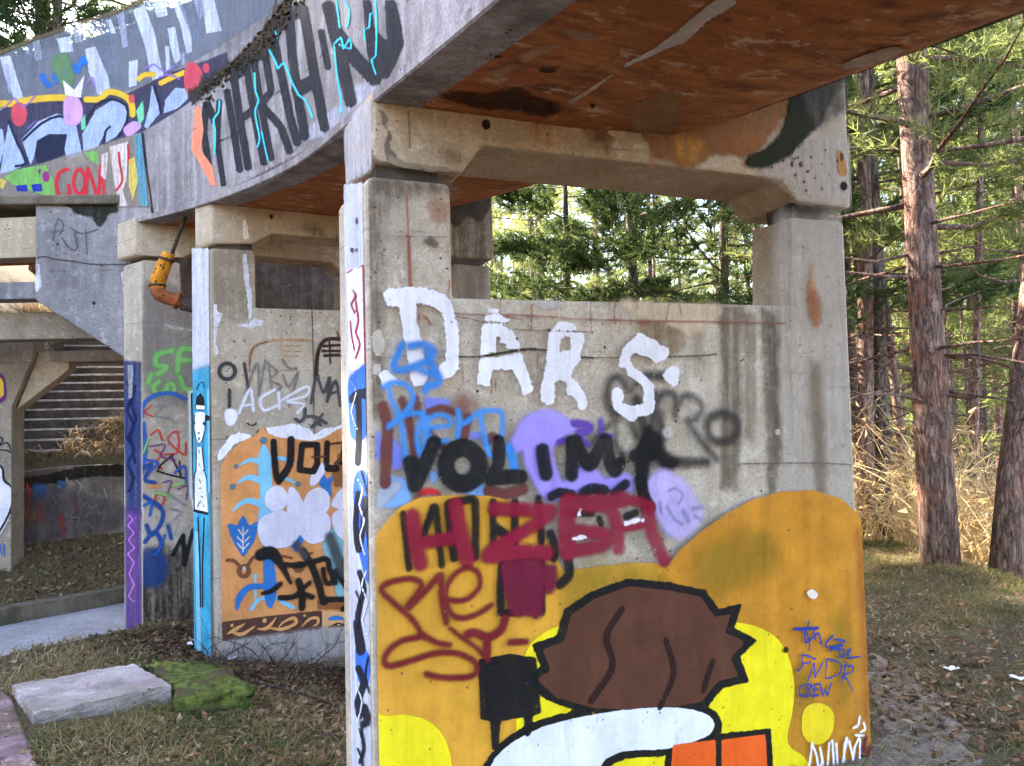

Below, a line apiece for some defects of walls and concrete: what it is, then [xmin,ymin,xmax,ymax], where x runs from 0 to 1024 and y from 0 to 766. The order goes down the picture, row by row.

rust [642,99,788,167]
rust [808,282,821,326]
leakage [623,300,780,490]